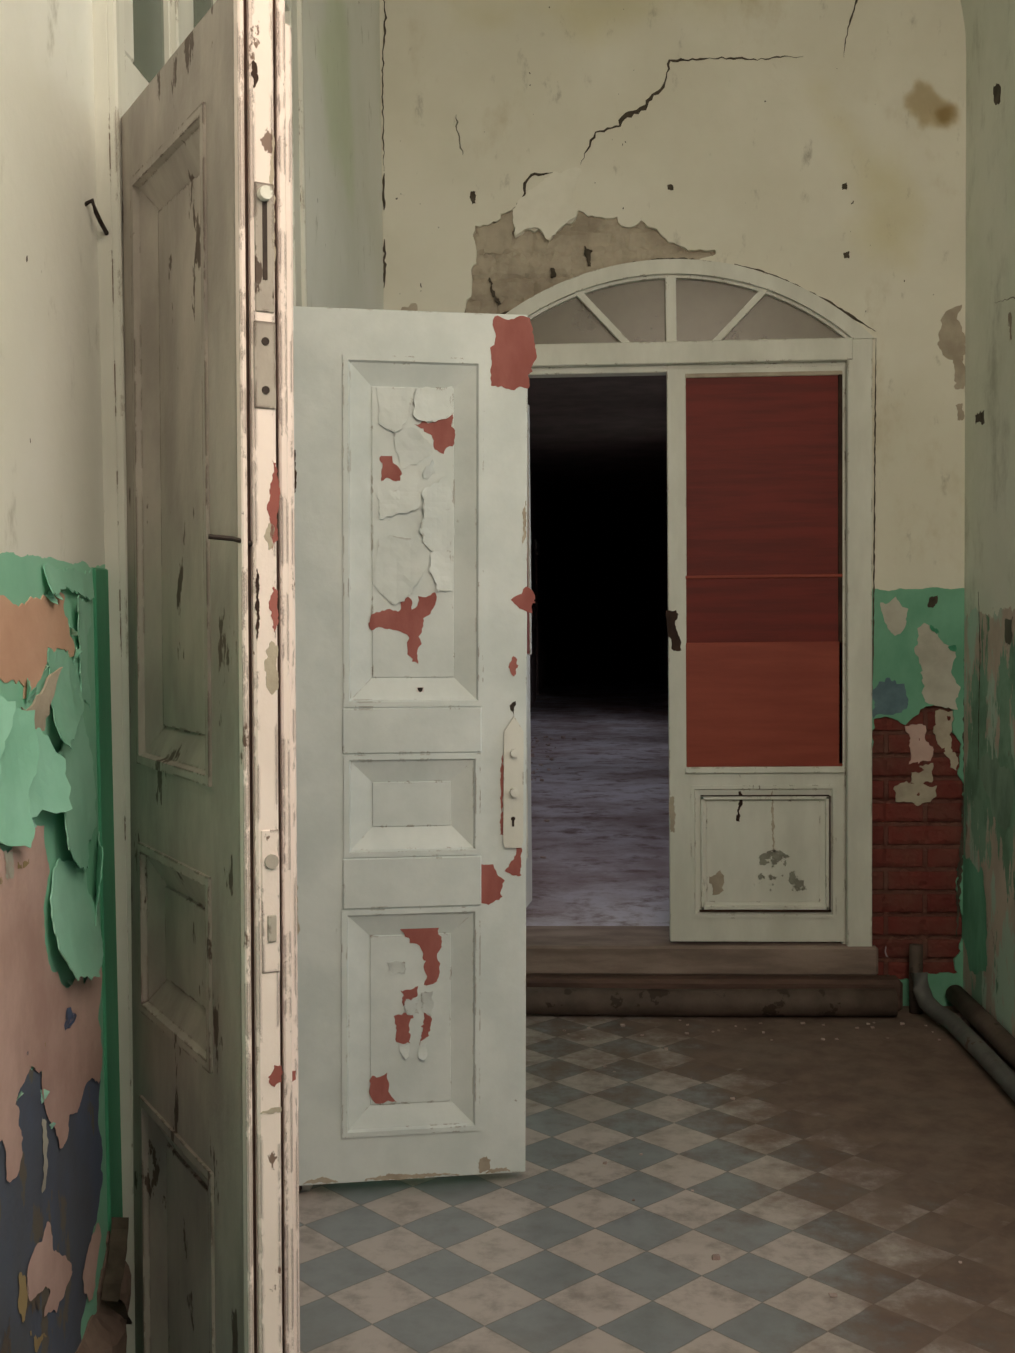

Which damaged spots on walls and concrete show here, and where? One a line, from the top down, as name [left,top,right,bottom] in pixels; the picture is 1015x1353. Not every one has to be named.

crack [844,0,858,51]
crack [513,55,803,209]
flaking render [464,167,715,314]
peeling [937,305,985,425]
peeling [1005,617,1013,645]
flaking render [872,597,987,980]
peeling [0,563,103,1353]